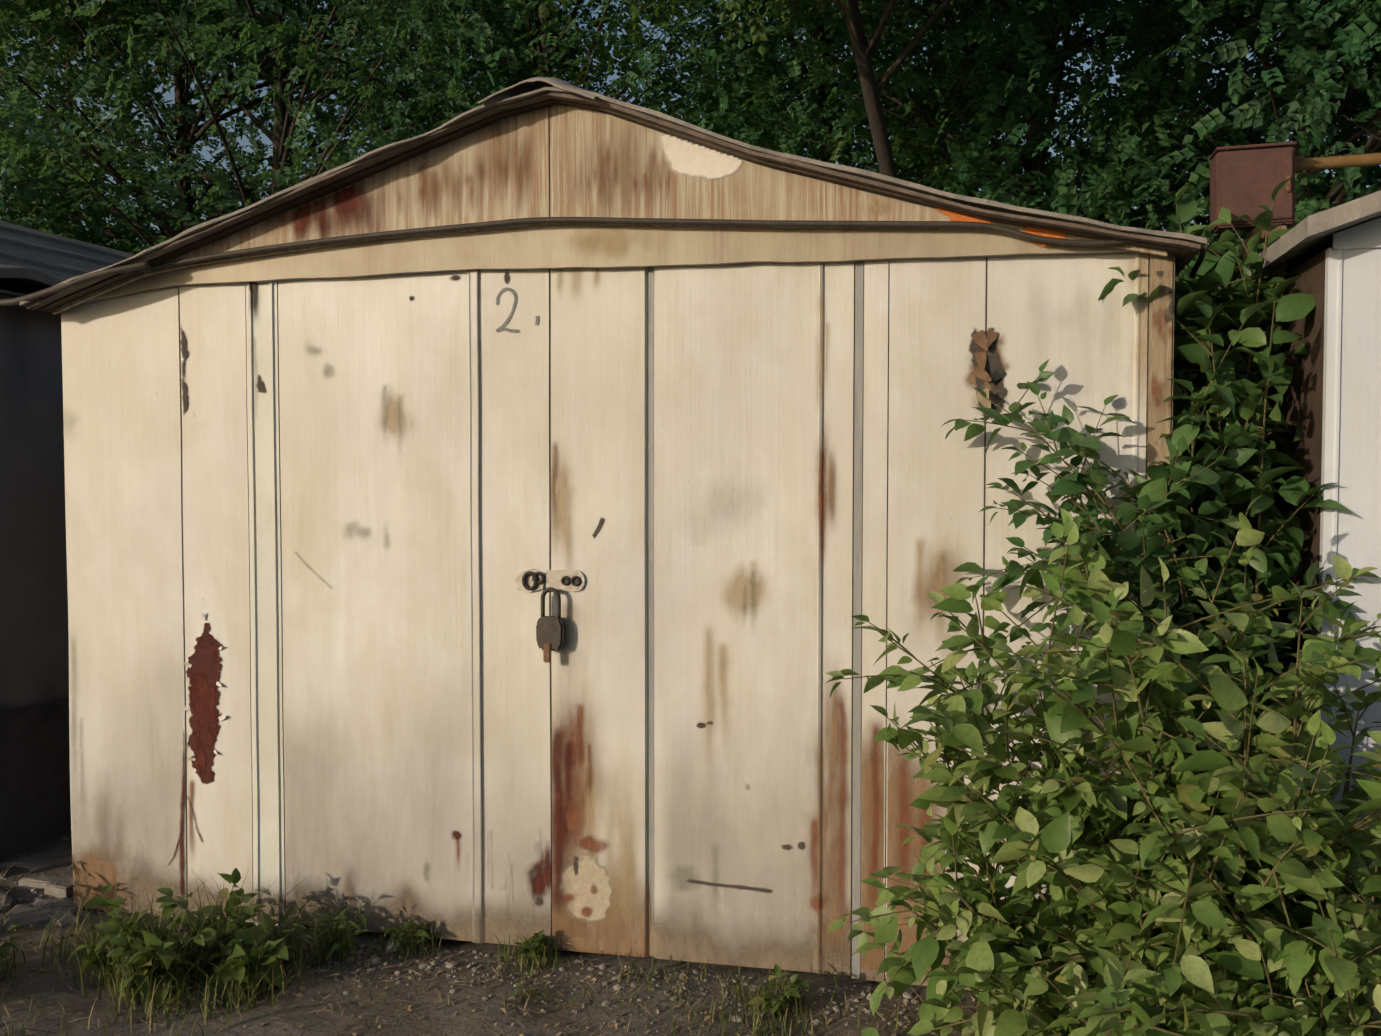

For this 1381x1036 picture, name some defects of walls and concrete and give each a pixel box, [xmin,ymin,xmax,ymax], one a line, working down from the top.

peeling [661,135,742,179]
corrosion [281,185,370,238]
peeling [971,330,1006,409]
corrosion [819,448,834,546]
corrosion [529,706,651,957]
corrosion [811,694,943,975]
peeling [560,854,612,922]